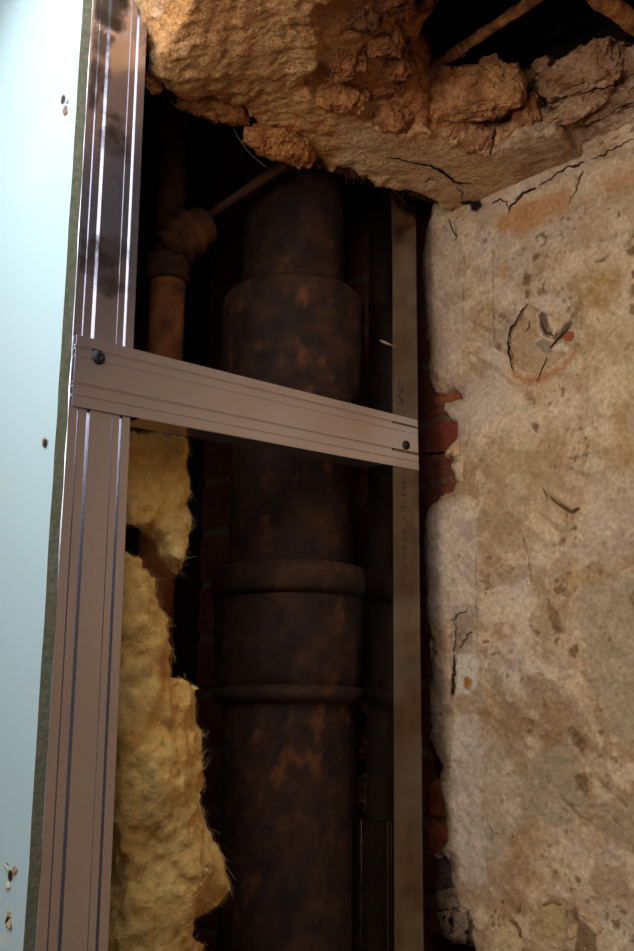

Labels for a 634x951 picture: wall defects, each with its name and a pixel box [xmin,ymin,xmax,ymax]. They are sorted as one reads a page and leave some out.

spalling [319,0,634,160]
crack [387,157,472,197]
crack [492,139,634,214]
crack [507,304,530,372]
spalling [423,387,464,508]